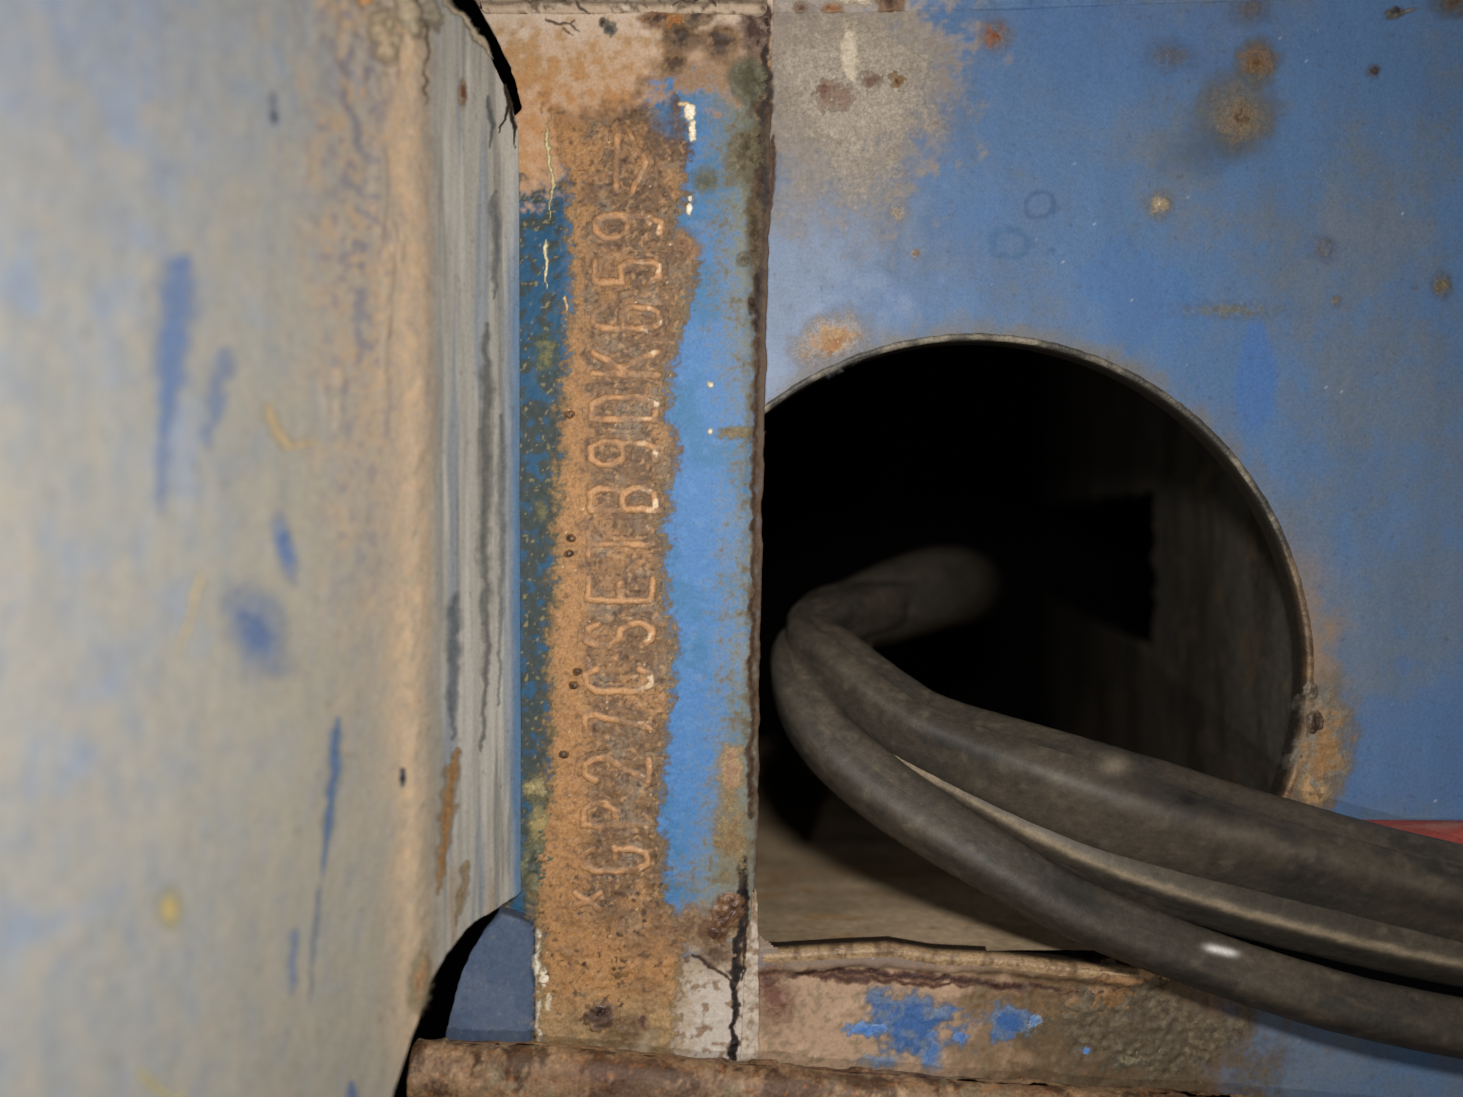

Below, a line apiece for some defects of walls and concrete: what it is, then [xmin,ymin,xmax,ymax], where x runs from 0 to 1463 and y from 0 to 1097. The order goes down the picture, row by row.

rust [458,80,467,106]
rust [638,5,772,75]
rust [811,70,906,115]
peeling [771,0,946,209]
rust [981,22,1008,50]
rust [1205,40,1275,151]
rust [1367,65,1380,77]
rust [1387,6,1415,19]
rust [407,96,1283,1097]
rust [1290,674,1357,808]
spalling [1094,968,1157,987]
peeling [842,986,1043,1071]